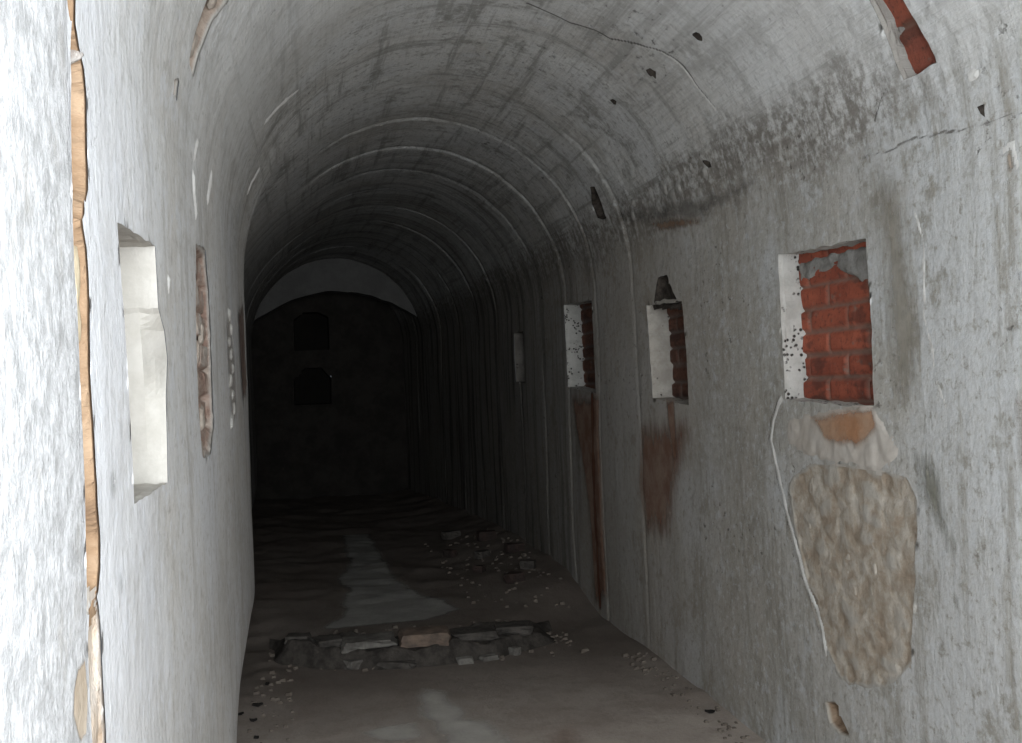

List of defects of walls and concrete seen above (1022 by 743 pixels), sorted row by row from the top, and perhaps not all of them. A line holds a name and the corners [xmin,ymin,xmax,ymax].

spalling [190,0,229,77]
spalling [869,0,936,80]
crack [967,69,979,82]
crack [887,129,964,152]
flaking render [196,244,213,458]
rust [641,401,683,531]
flaking render [789,463,917,688]
flaking render [74,662,88,739]